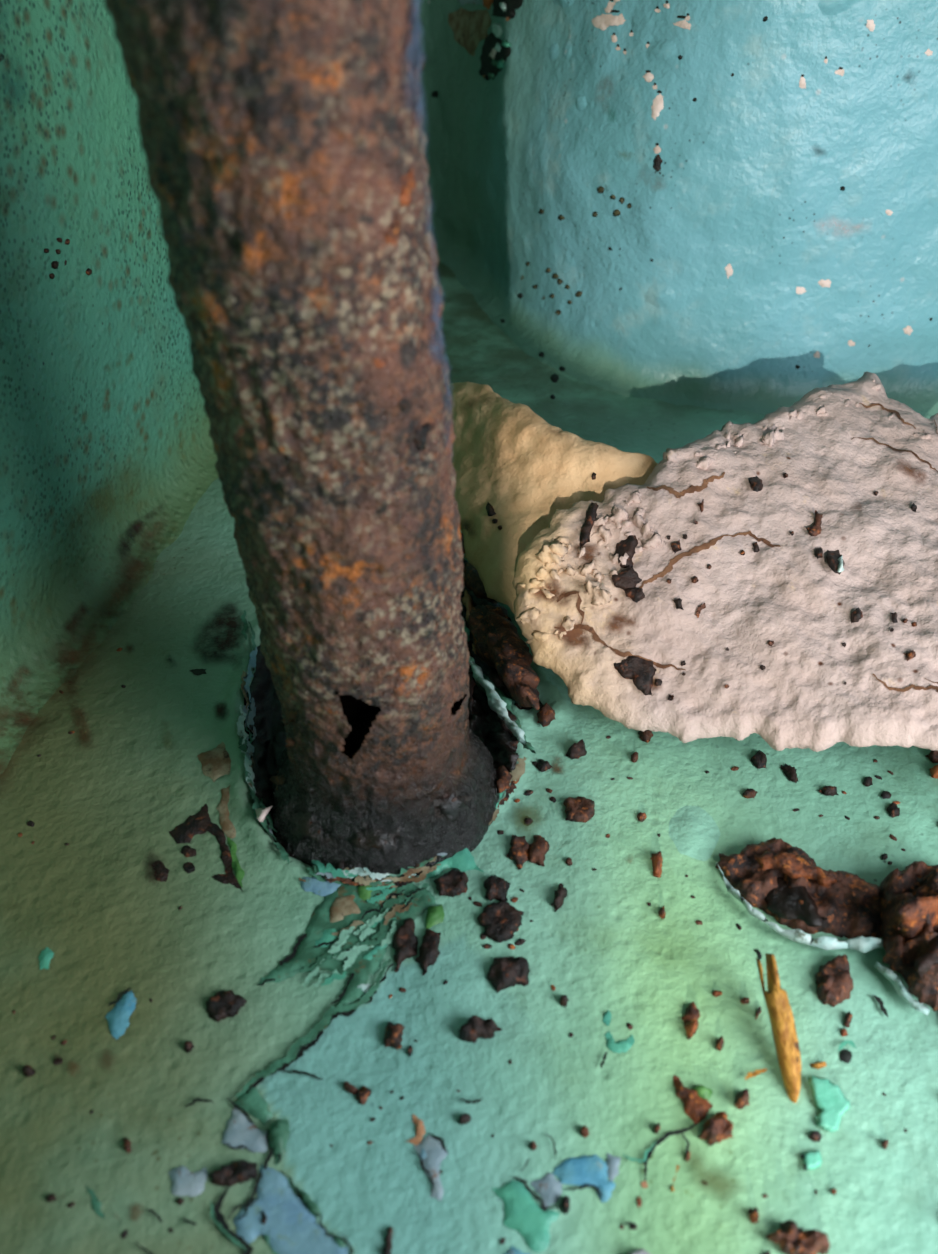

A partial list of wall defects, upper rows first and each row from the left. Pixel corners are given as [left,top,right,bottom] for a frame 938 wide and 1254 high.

spalling [643,70,664,120]
corrosion [412,422,436,451]
crack [647,472,725,498]
crack [639,531,781,588]
corrosion [190,606,240,675]
crack [554,591,686,670]
spalling [460,585,543,825]
crack [873,673,938,692]
peeling [148,610,484,1254]
corrosion [740,997,762,1020]
corrosion [815,954,853,1036]
peeling [492,1133,621,1254]